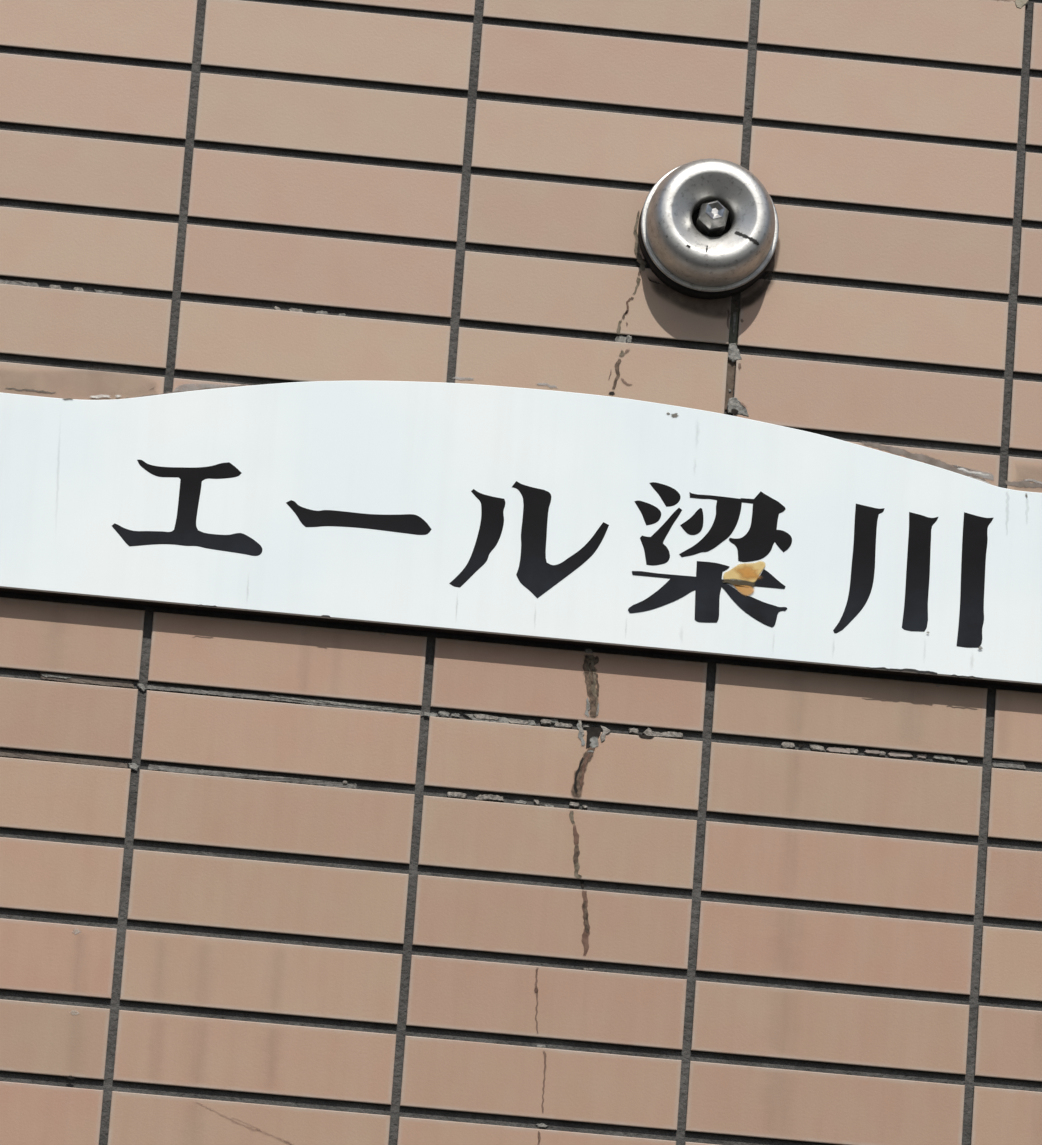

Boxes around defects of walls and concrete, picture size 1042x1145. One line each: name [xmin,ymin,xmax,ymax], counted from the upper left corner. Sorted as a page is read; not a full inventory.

crack [609,271,641,395]
rust [723,561,765,595]
spalling [424,711,590,729]
spalling [628,727,683,739]
spalling [781,742,968,763]
crack [569,649,610,955]